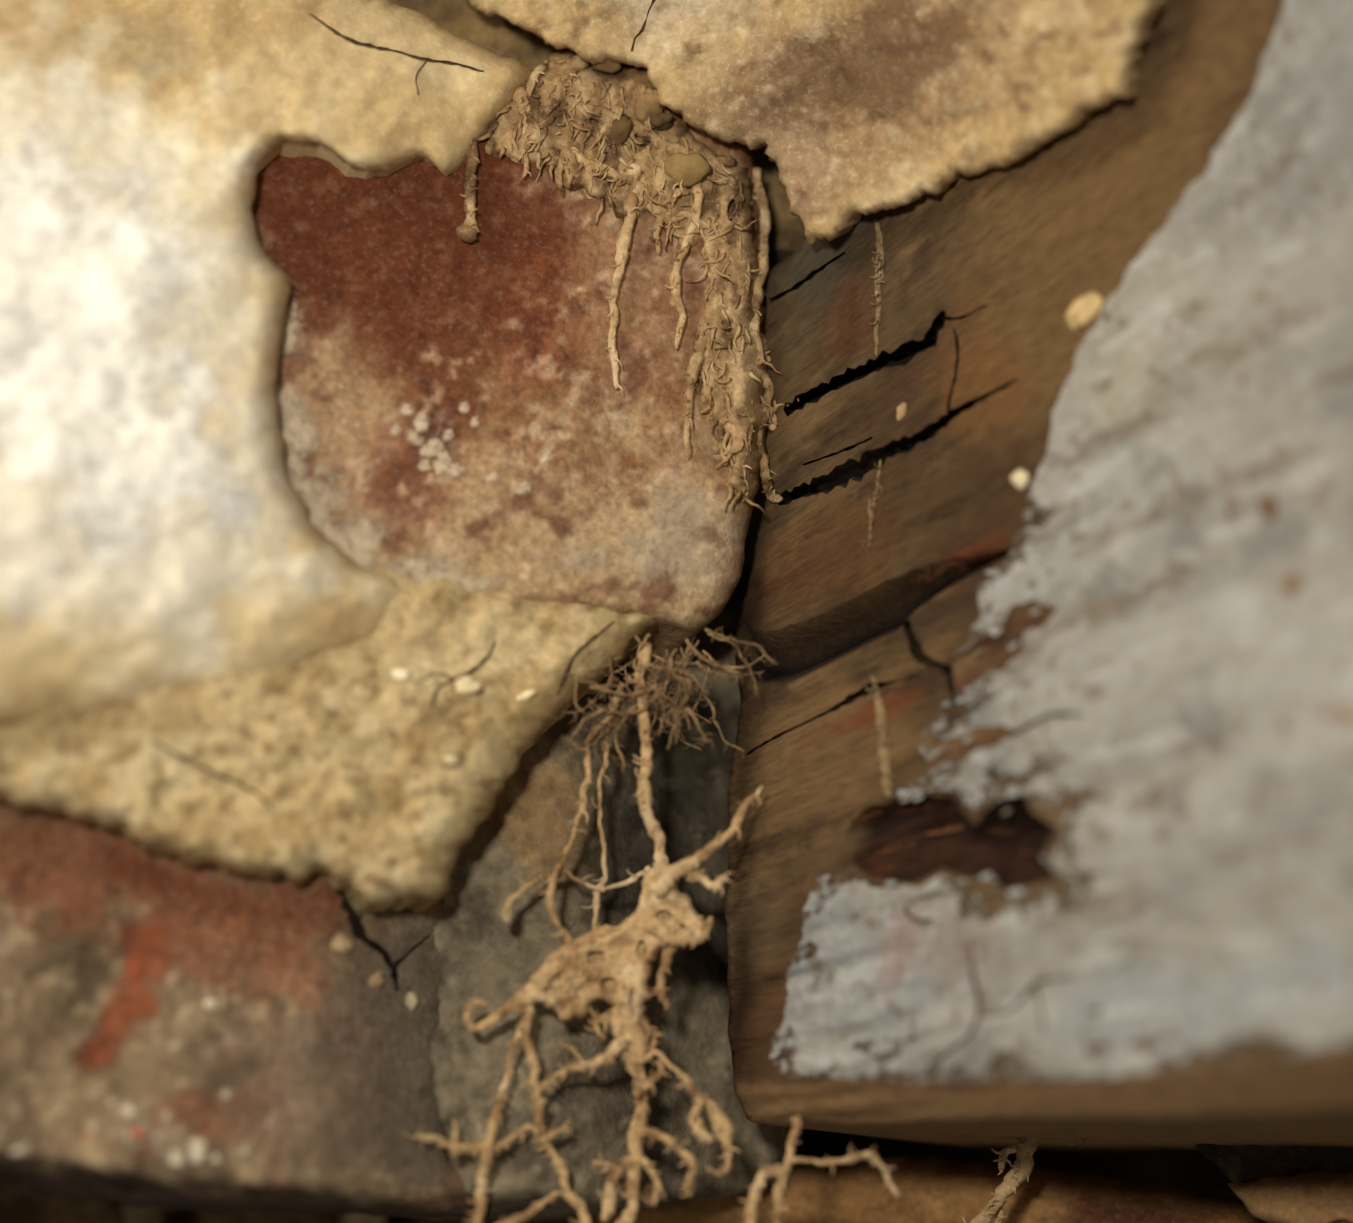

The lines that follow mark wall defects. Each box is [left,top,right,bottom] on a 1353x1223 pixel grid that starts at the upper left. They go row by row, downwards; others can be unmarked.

crack [309,14,484,95]
crack [631,0,656,51]
crack [776,304,1018,506]
crack [737,549,1011,755]
crack [960,712,1083,749]
crack [326,877,434,991]
crack [1329,1215,1353,1223]